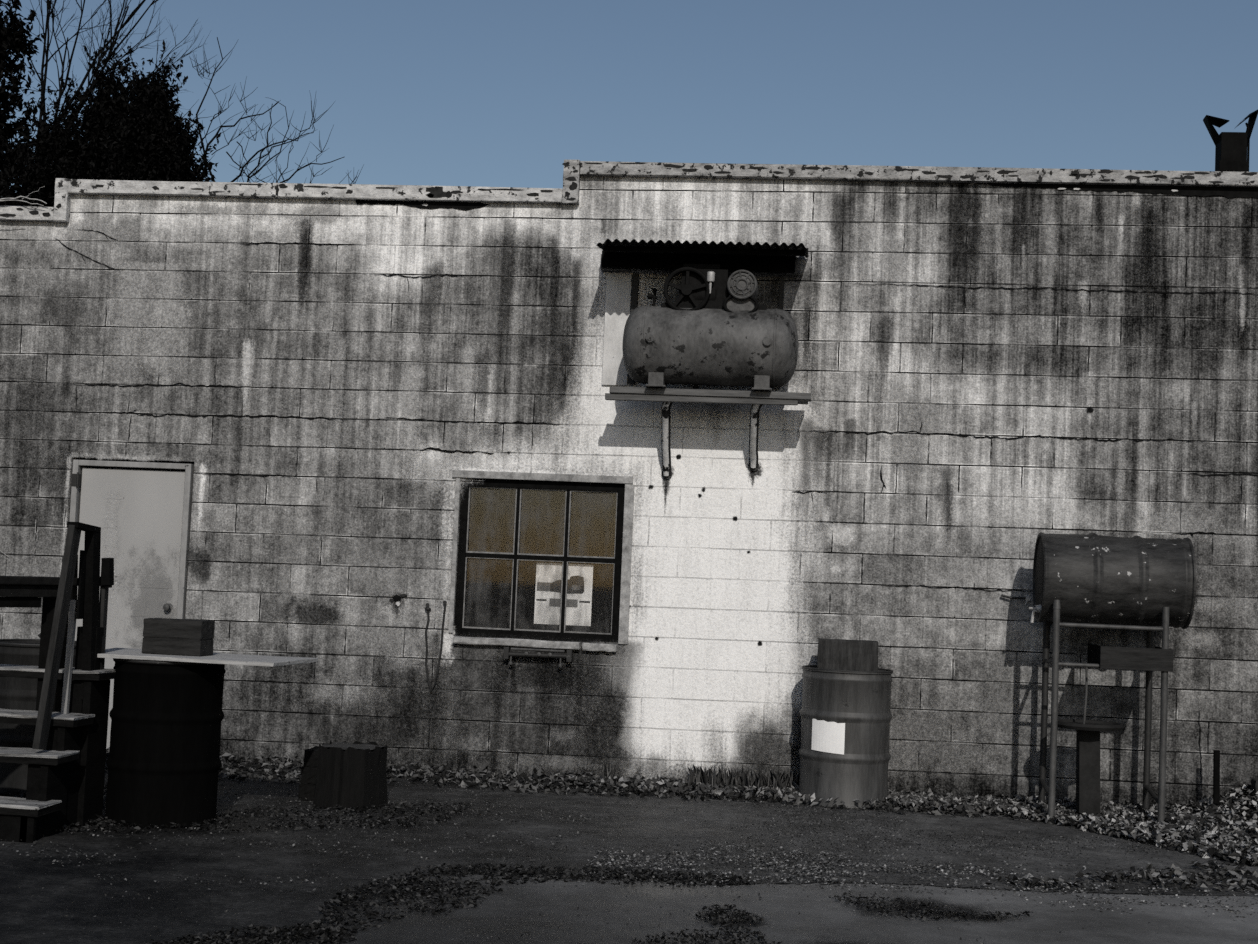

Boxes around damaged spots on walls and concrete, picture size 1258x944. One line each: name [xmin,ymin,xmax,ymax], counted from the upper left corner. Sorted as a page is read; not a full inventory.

peeling [190,183,288,196]
spalling [422,186,463,206]
spalling [478,162,602,200]
peeling [663,164,731,173]
peeling [895,168,1018,178]
peeling [1058,169,1223,192]
water stain [181,205,339,305]
water stain [1046,214,1058,303]
water stain [1118,193,1159,326]
water stain [1238,209,1254,327]
water stain [539,240,579,390]
efflorescence [242,338,255,414]